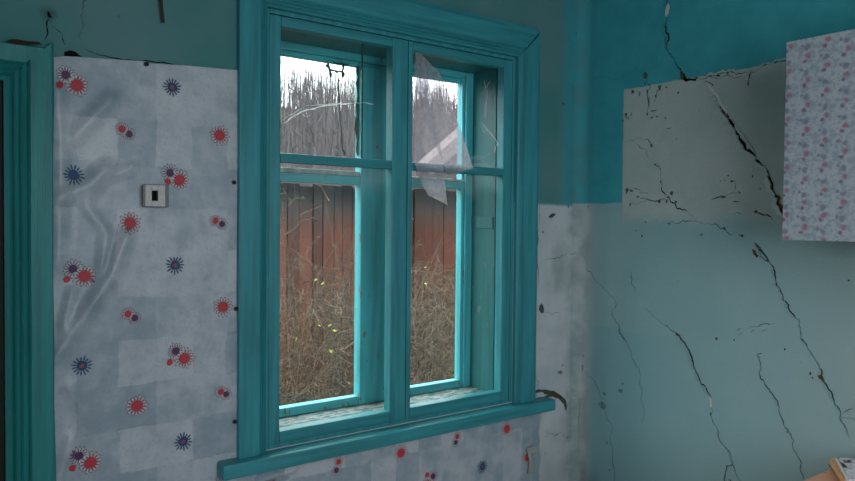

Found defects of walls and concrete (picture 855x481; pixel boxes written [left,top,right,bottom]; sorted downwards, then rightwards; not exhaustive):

crack [79,0,187,66]
flaking render [622,62,786,234]
crack [625,0,855,438]
crack [537,207,739,481]
crack [756,353,805,481]